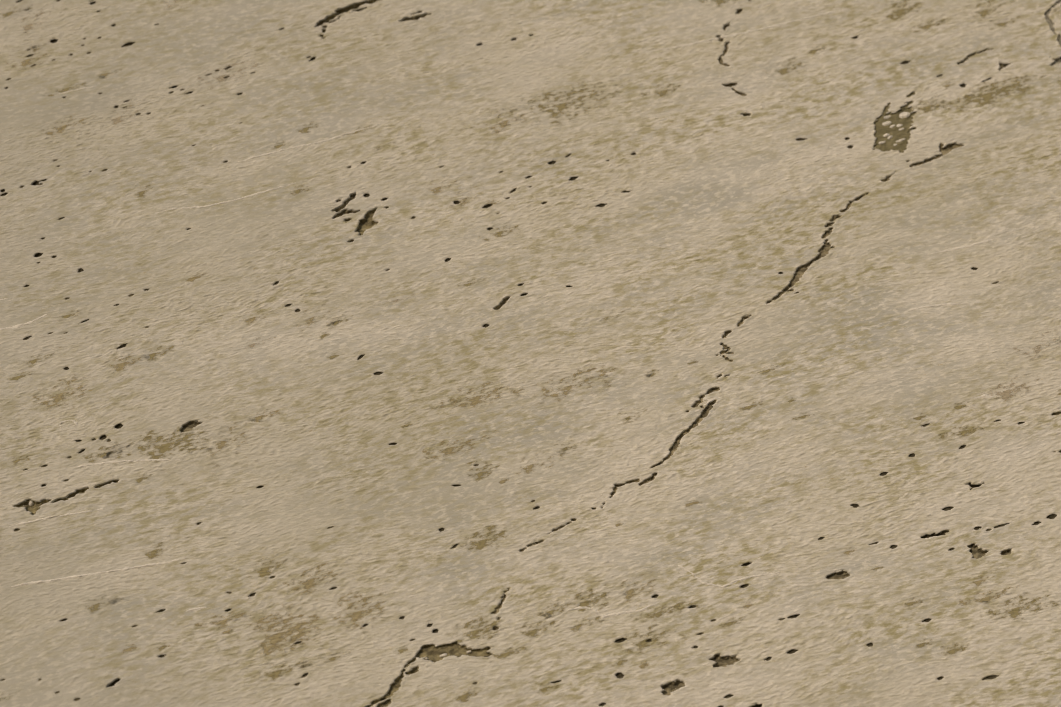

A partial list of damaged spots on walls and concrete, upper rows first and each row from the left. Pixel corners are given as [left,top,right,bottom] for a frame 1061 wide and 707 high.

crack [316,0,379,39]
crack [717,0,751,116]
crack [1045,0,1061,66]
spalling [873,92,916,153]
spalling [333,193,389,242]
crack [520,143,964,552]
crack [366,588,509,707]